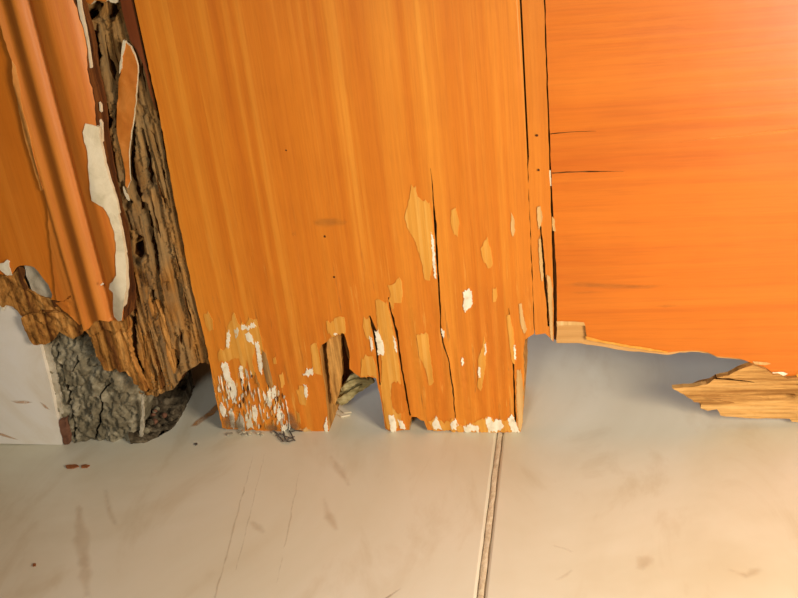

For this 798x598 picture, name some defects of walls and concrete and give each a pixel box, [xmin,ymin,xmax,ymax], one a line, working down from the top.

peeling [77,0,93,68]
peeling [0,260,12,276]
flaking render [24,265,52,298]
crack [56,344,109,439]
peeling [83,40,139,321]
peeling [213,313,322,432]
peeling [326,316,346,337]
peeling [361,277,406,432]
crack [370,297,411,416]
peeling [405,185,437,281]
crack [430,168,456,418]
peeling [428,303,527,433]